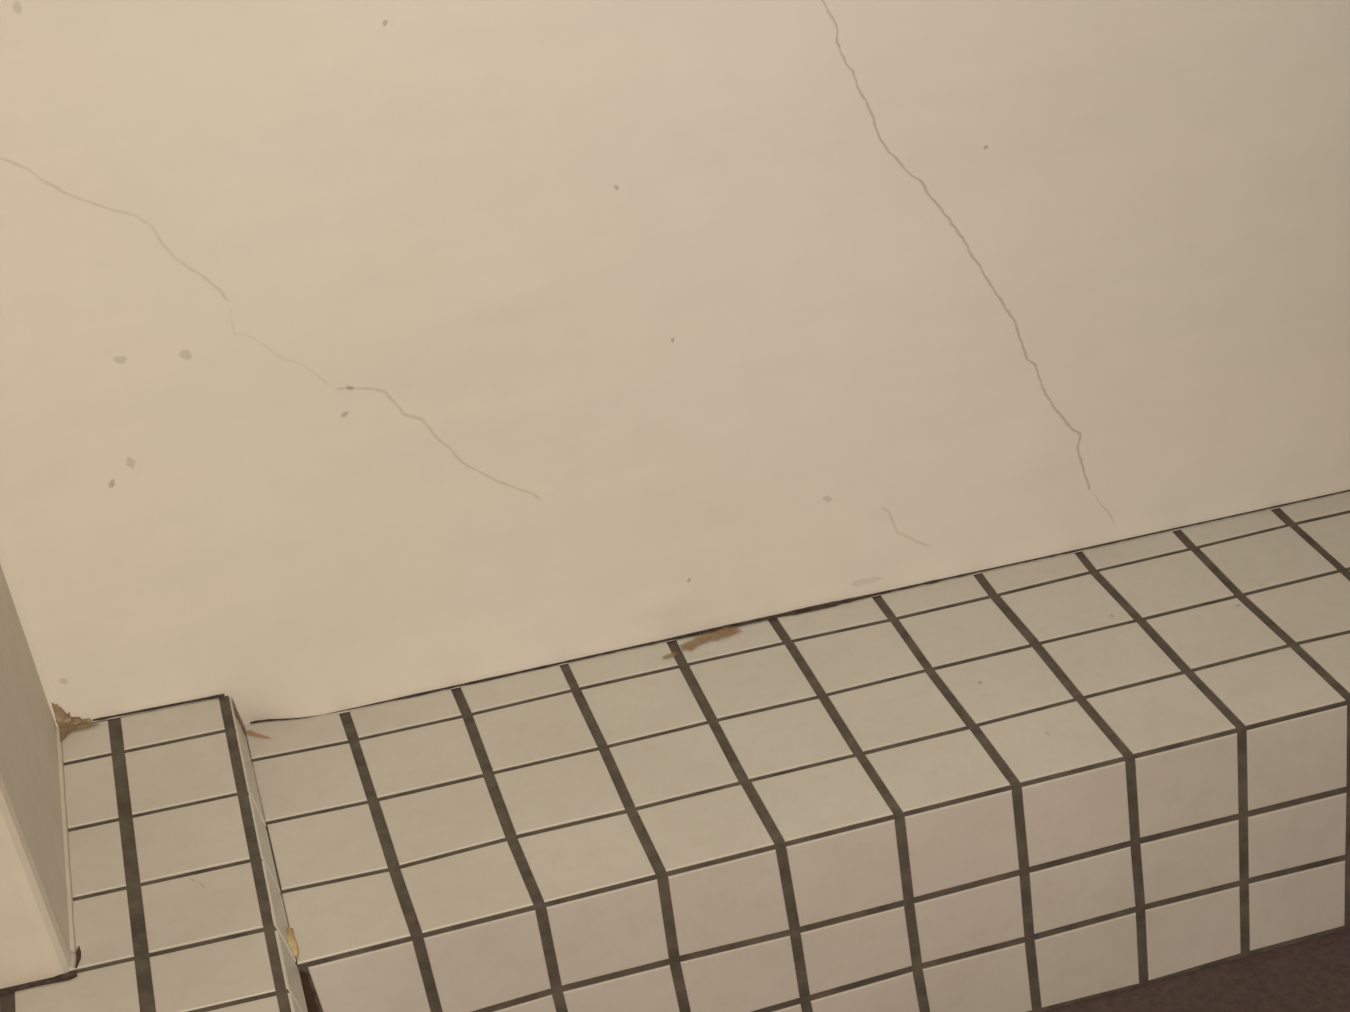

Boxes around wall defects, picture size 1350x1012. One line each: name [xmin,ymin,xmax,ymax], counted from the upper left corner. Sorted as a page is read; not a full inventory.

flaking render [52,703,100,742]